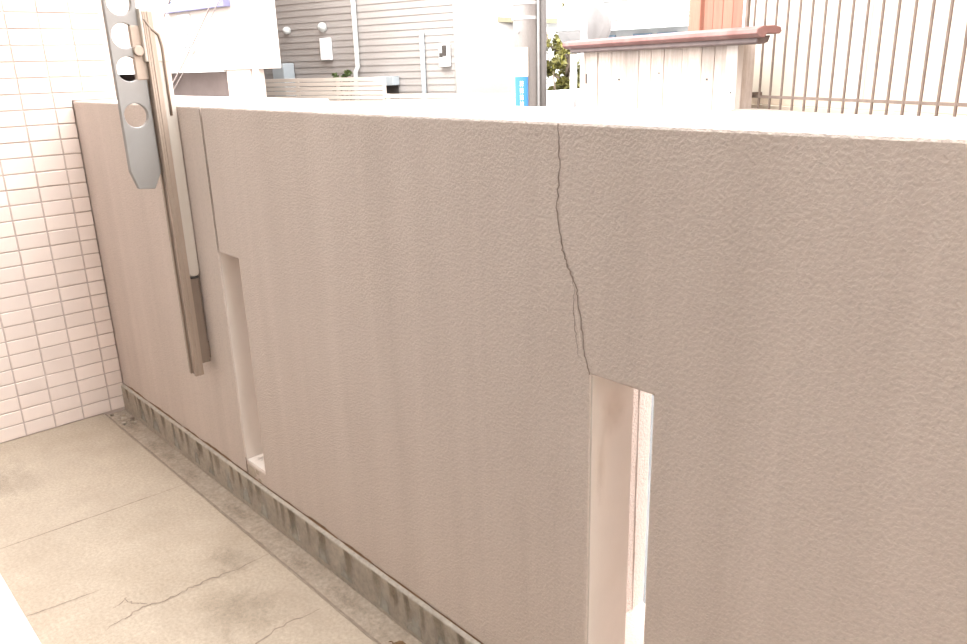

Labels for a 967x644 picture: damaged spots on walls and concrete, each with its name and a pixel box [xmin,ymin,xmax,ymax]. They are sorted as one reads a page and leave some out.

crack [556,124,590,375]
crack [108,554,269,629]
crack [255,609,319,644]